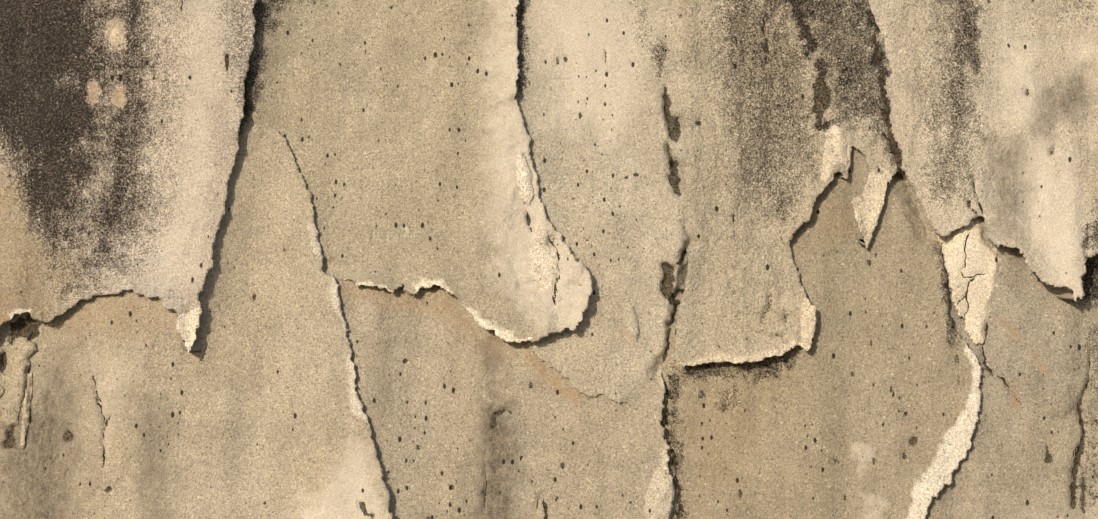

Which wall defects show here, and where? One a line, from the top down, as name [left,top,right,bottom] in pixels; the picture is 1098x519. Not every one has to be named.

flaking render [0,202,81,453]
damp [0,0,353,322]
flaking render [141,0,983,519]
damp [453,0,1098,519]
spalling [964,174,1020,267]
flaking render [1053,284,1080,302]
flaking render [1048,97,1098,162]
damp [0,318,187,519]
damp [252,407,393,519]
crack [662,366,691,519]
spalling [1042,444,1054,465]